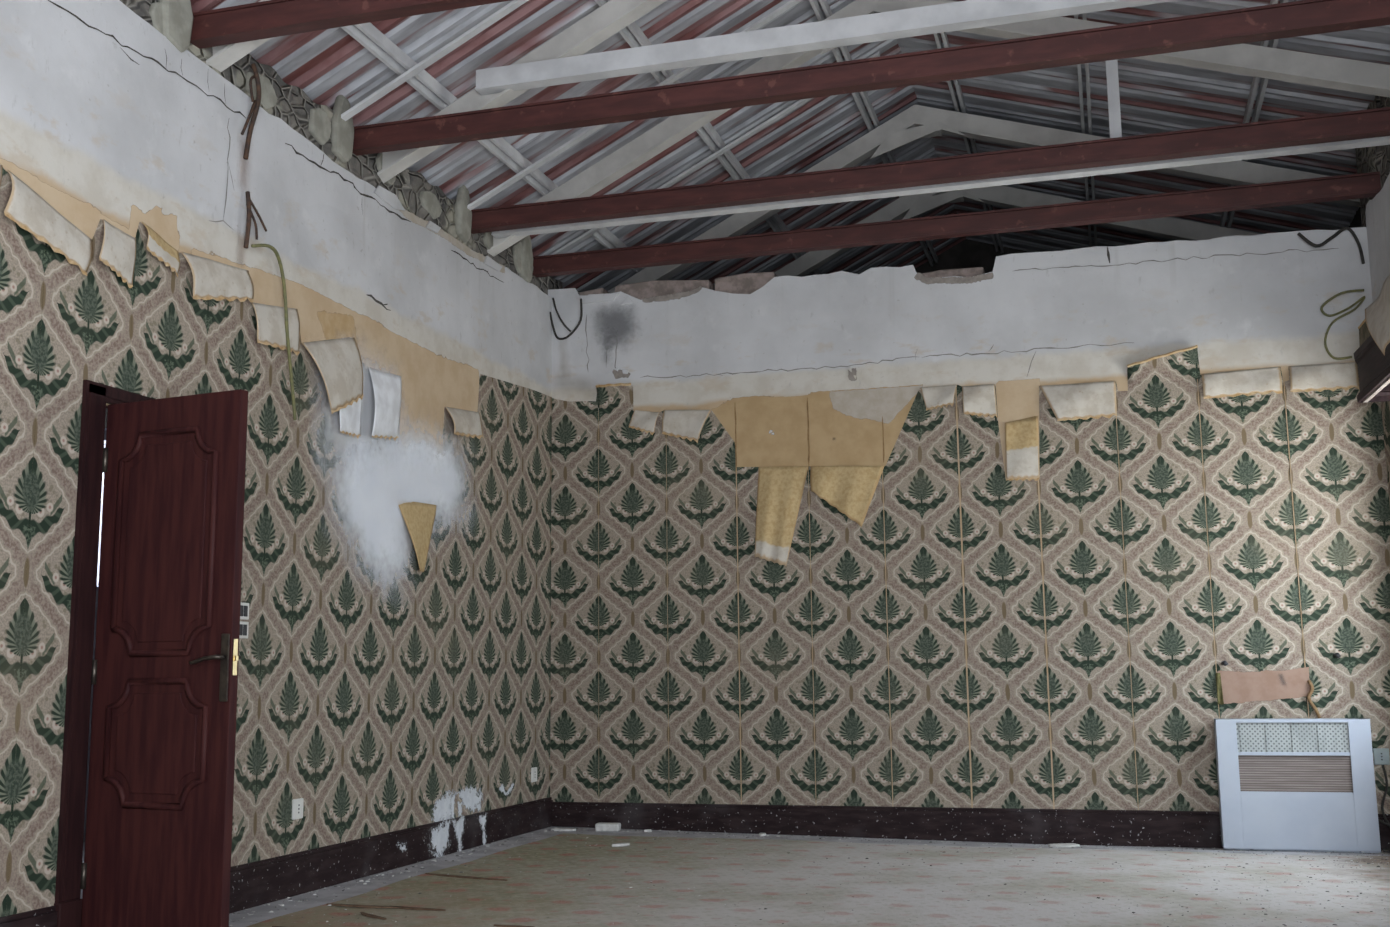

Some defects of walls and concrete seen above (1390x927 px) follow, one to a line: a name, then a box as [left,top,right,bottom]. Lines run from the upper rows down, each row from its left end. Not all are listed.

crack [48,0,246,228]
crack [285,143,411,222]
spalling [374,186,505,273]
crack [451,250,504,283]